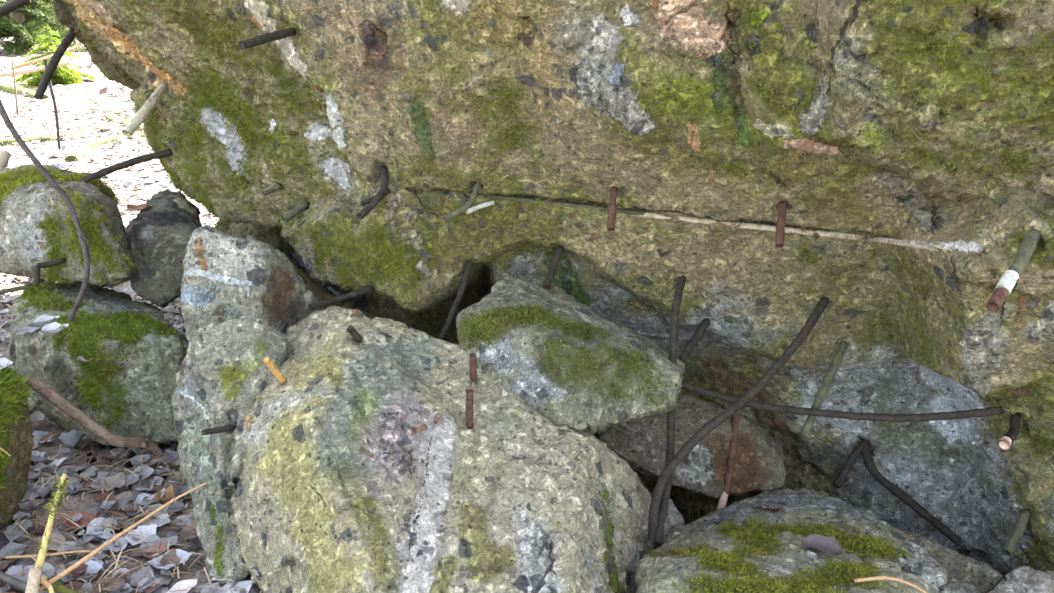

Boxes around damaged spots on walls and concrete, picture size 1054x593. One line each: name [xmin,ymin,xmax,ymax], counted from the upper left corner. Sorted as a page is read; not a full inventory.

crack [417,194,446,216]
crack [512,194,822,231]
crack [930,201,938,226]